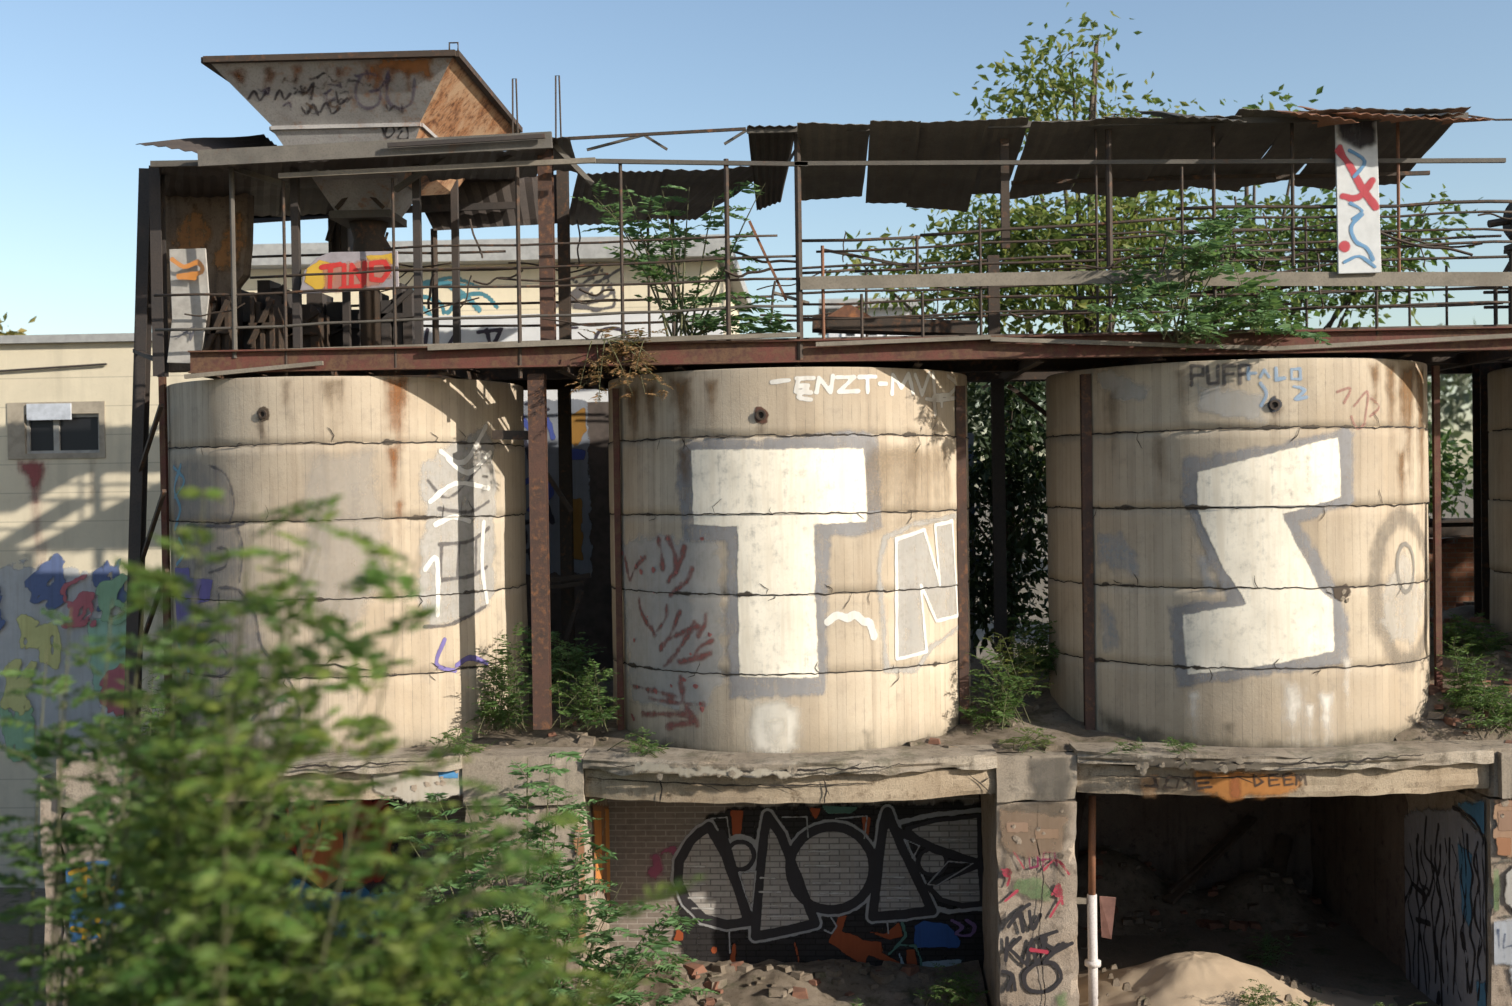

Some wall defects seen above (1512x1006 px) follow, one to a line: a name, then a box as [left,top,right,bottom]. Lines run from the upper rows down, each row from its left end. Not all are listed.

corrosion [388,378,406,426]
damp [1373,367,1424,464]
spalling [634,759,797,781]